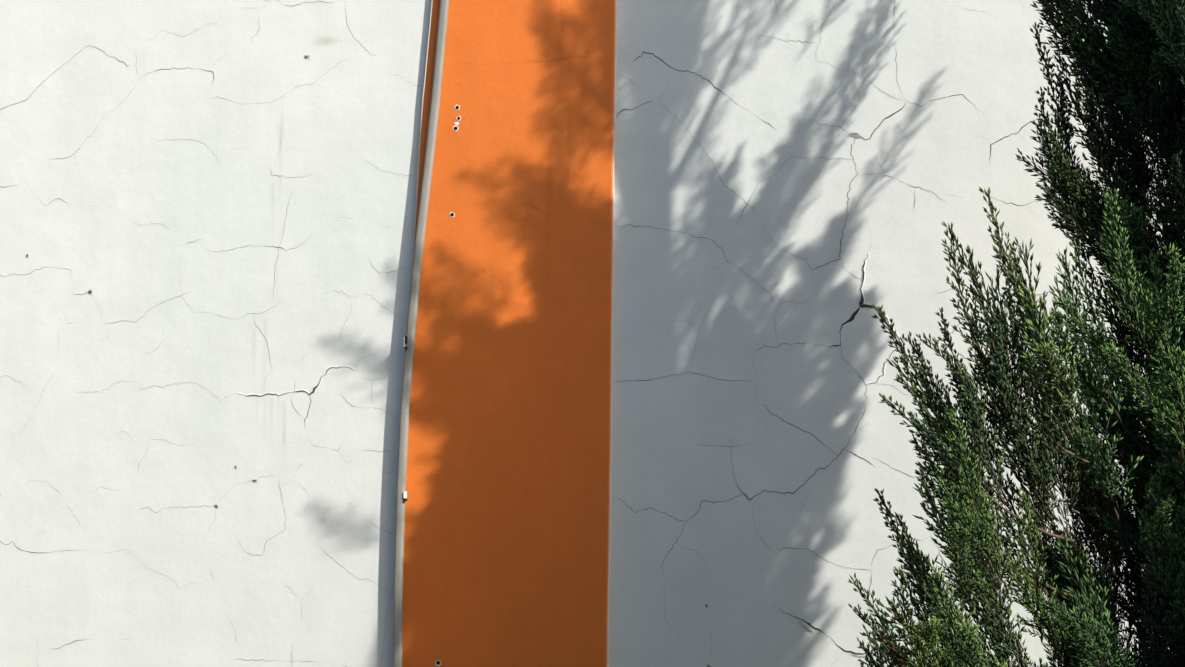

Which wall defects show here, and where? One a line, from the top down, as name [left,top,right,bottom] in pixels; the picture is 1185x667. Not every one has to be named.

crack [3,166,311,357]
crack [593,3,1013,655]
crack [0,478,113,553]
crack [95,348,394,556]